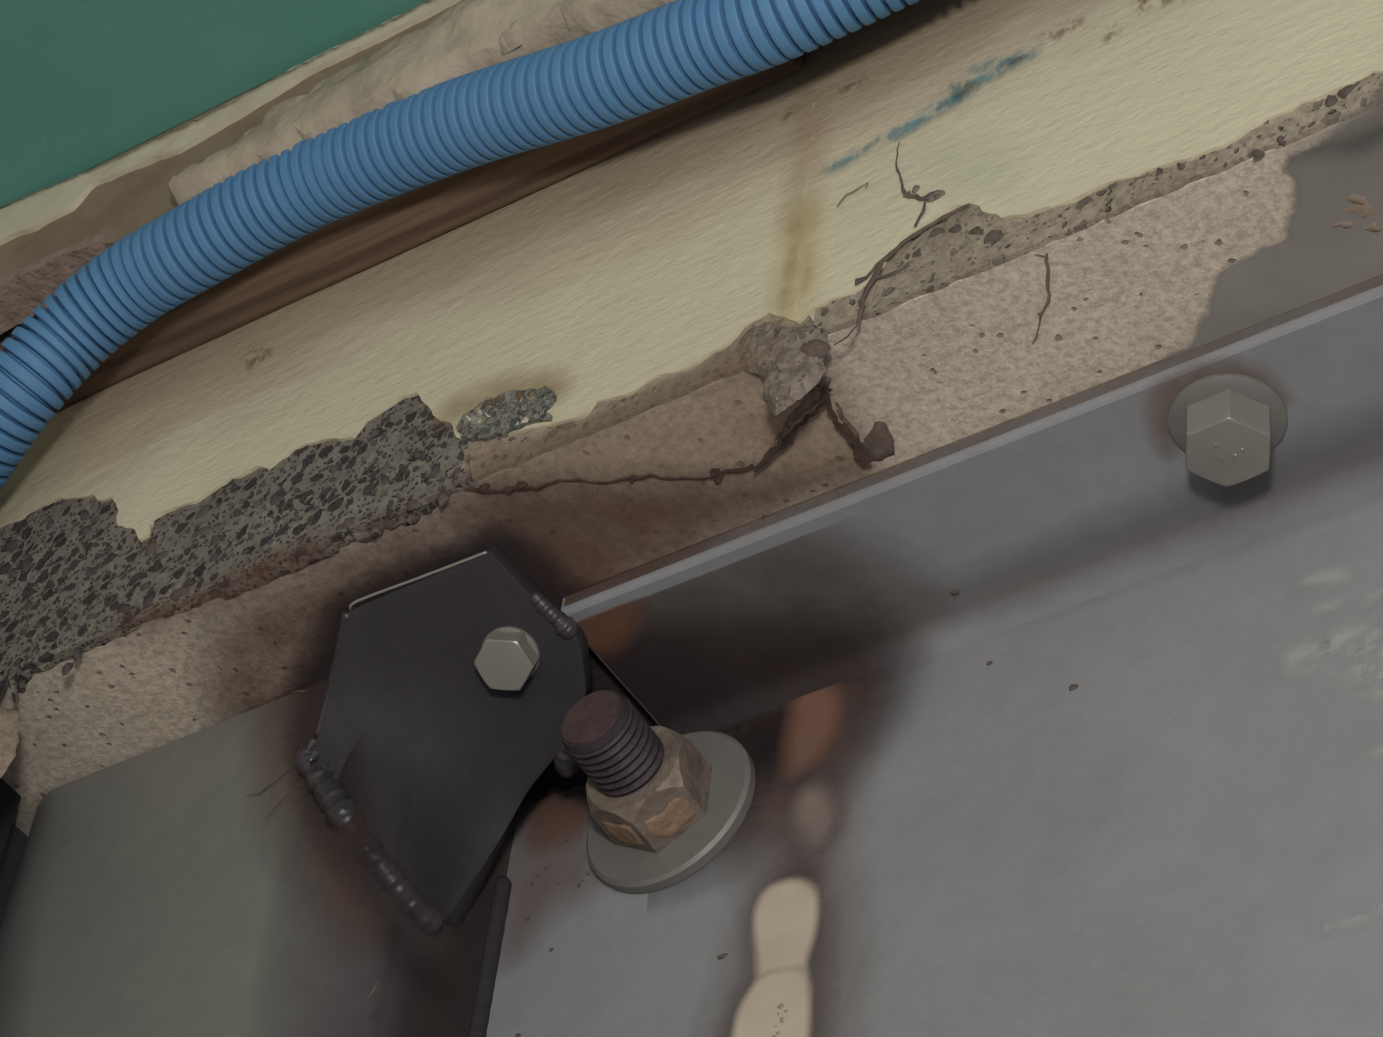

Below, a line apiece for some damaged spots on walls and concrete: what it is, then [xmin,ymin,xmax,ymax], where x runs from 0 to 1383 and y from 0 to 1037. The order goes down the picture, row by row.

spalling [0,0,676,246]
crack [464,387,872,494]
spalling [0,73,1383,703]
crack [834,141,969,346]
crack [1032,252,1051,343]
leakage [1157,89,1383,363]
spalling [0,778,28,928]
rust [601,797,695,846]